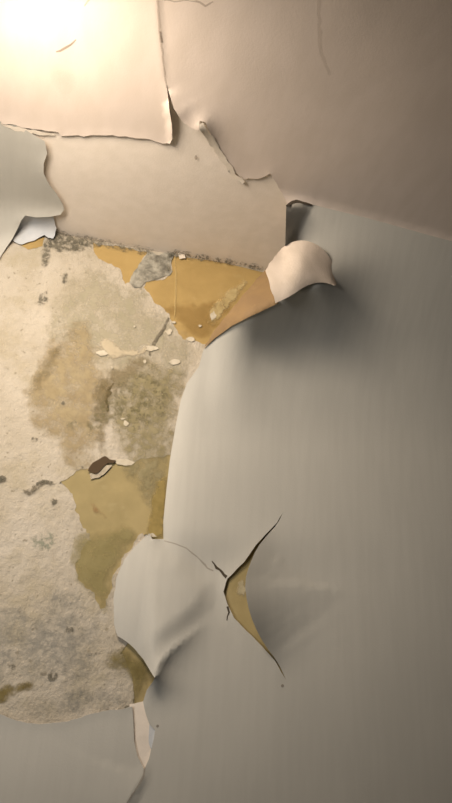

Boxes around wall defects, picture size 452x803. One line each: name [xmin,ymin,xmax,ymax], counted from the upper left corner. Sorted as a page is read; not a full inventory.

mould [42,229,151,265]
mould [174,251,261,270]
damp [31,276,185,501]
flaking render [0,87,452,724]